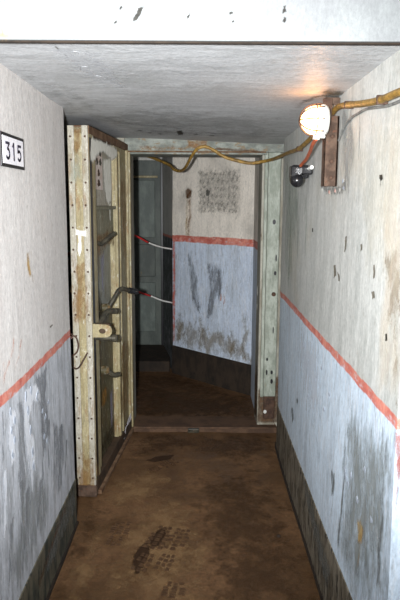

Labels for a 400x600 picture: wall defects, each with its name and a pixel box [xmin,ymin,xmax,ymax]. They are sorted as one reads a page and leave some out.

leakage [208,264,221,314]
leakage [9,479,48,582]
leakage [54,424,67,491]
leakage [337,427,387,581]